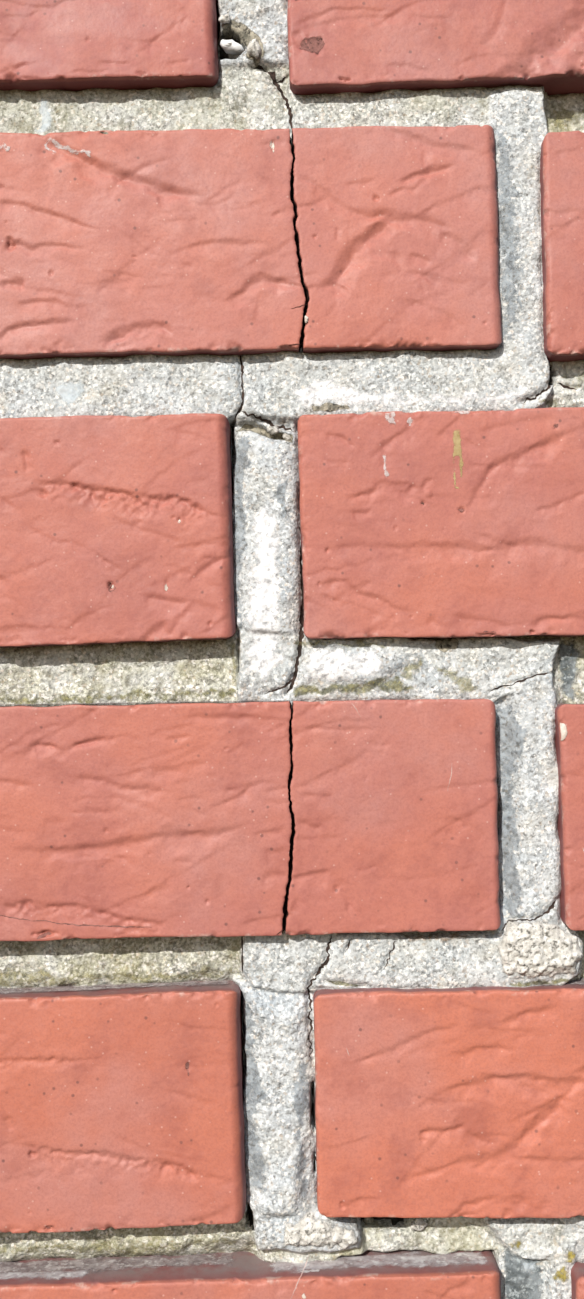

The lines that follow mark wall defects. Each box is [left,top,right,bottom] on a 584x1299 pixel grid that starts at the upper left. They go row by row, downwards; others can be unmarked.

crack [253,65,309,352]
crack [235,356,294,432]